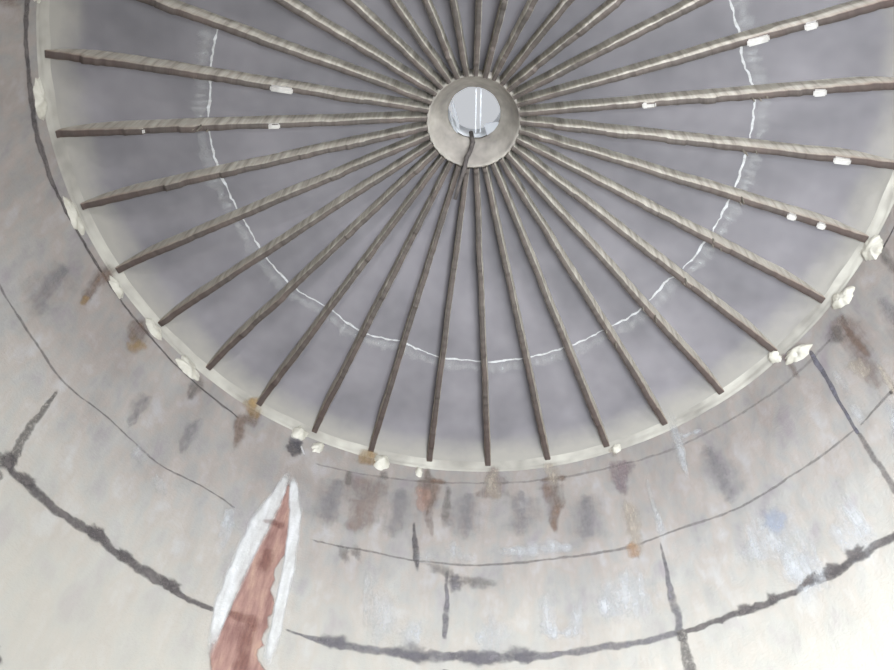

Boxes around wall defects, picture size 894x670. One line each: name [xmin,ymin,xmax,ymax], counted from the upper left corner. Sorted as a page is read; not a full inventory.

crack [207,0,756,363]
crack [10,468,214,611]
crack [288,533,894,665]
crack [483,390,892,565]